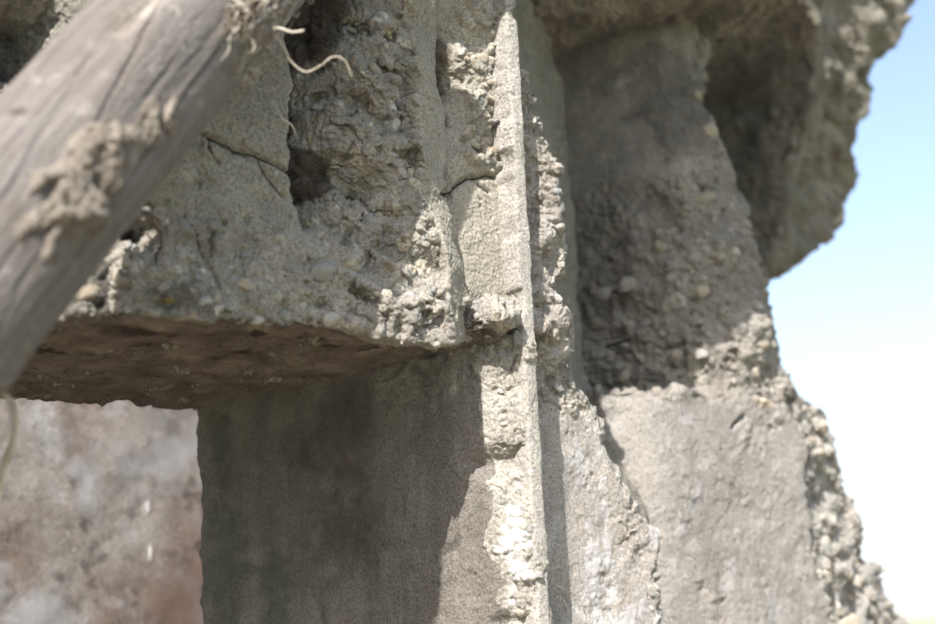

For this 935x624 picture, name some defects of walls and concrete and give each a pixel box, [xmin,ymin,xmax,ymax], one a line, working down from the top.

spalling [0,0,88,94]
spalling [464,38,495,120]
crack [200,134,282,196]
spalling [58,0,456,350]
crack [440,175,494,196]
spalling [520,20,909,624]
spalling [470,330,549,624]